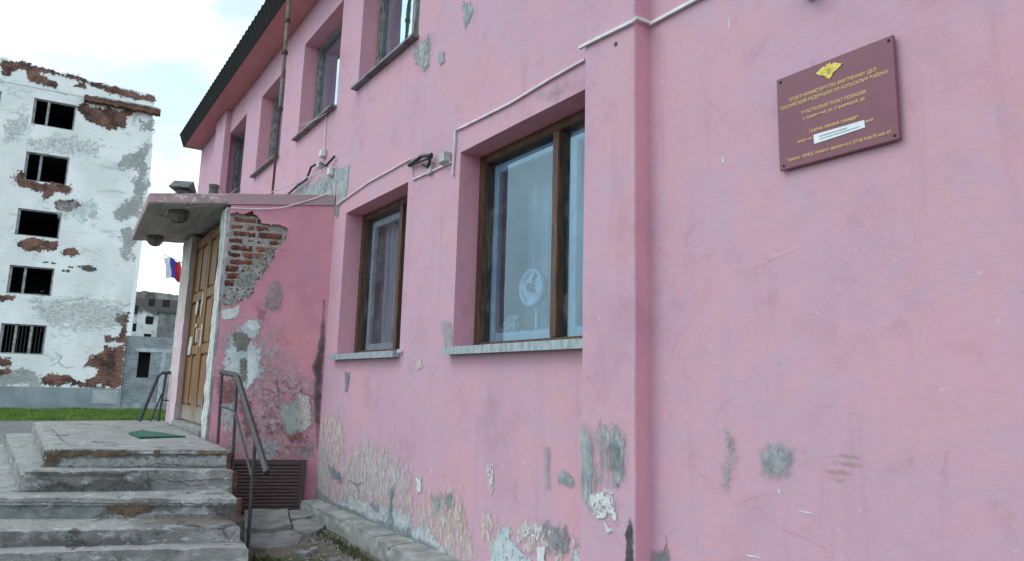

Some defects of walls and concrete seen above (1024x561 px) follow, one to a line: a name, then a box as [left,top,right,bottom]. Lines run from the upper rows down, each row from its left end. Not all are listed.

peeling [412,33,445,69]
peeling [462,1,473,28]
flaking render [0,59,158,262]
peeling [296,165,350,218]
flaking render [16,237,97,273]
flaking render [0,298,131,388]
peeling [39,212,580,561]
water stain [313,326,325,446]
peeling [557,422,633,561]
peeling [760,445,791,494]